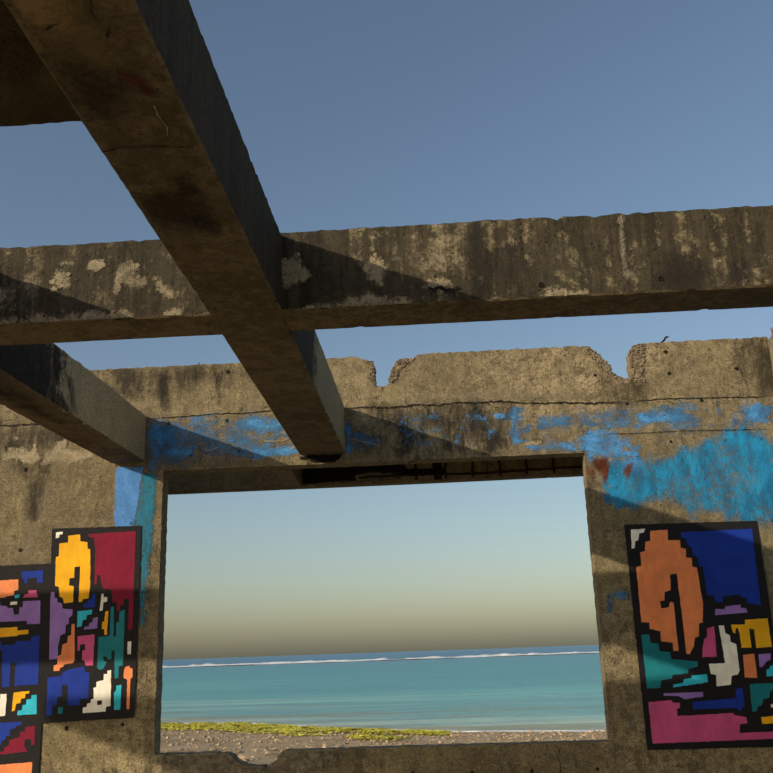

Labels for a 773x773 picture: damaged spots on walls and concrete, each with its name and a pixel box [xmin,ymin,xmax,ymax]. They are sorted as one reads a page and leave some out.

crack [153,406,271,423]
rust [589,459,608,483]
peeling [114,398,773,624]